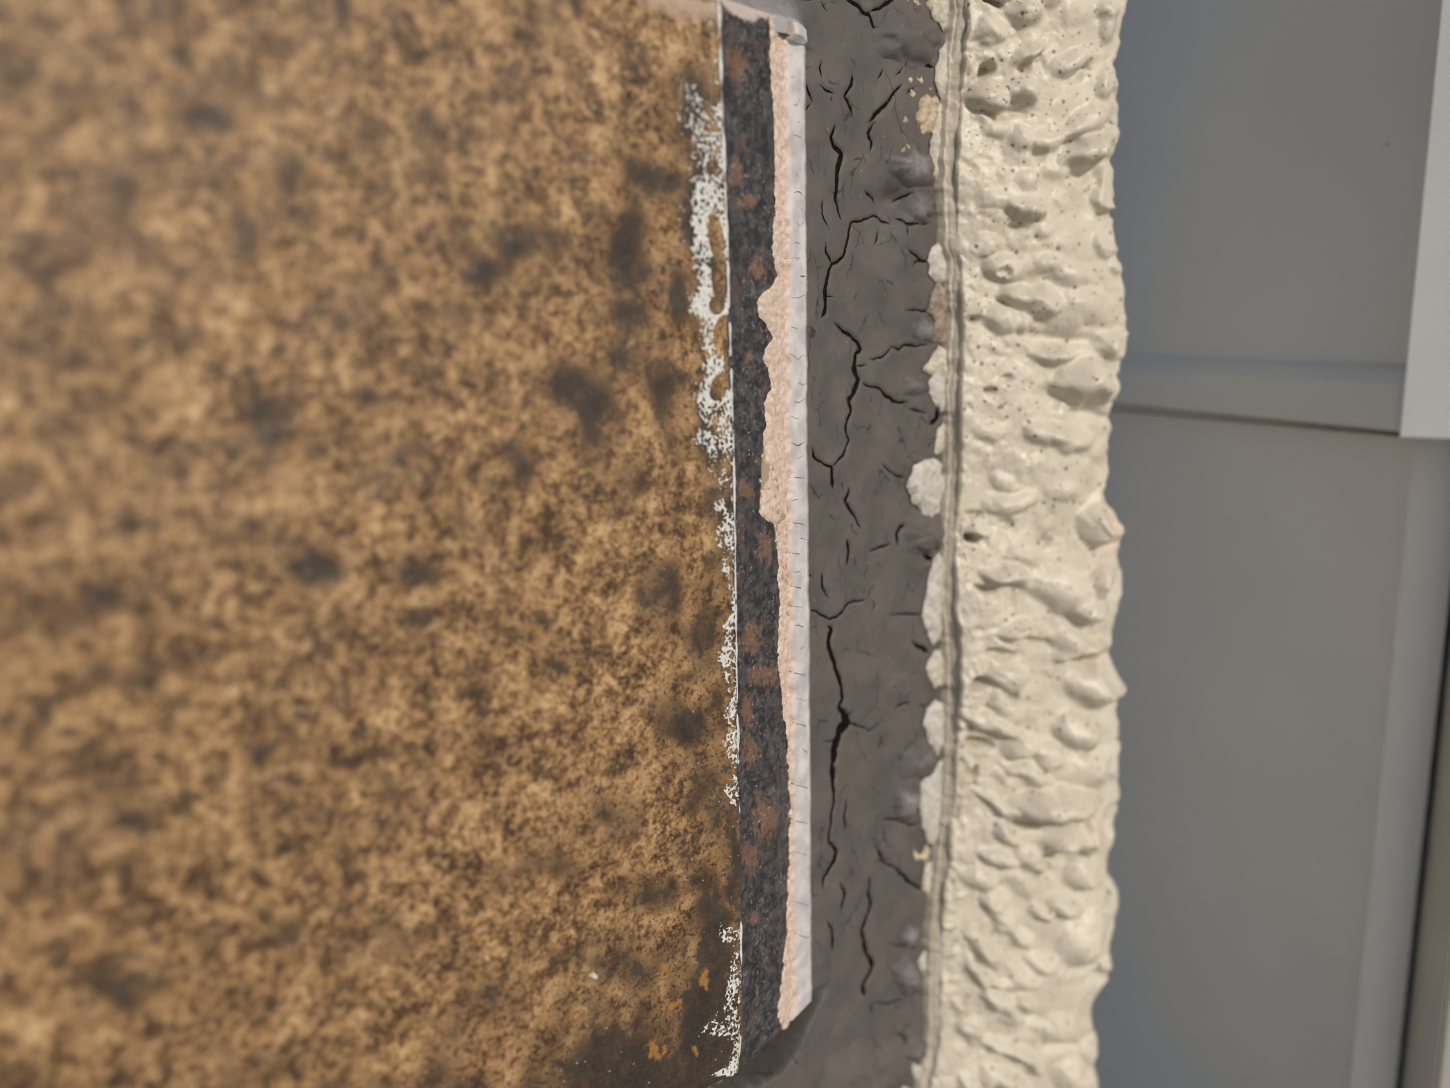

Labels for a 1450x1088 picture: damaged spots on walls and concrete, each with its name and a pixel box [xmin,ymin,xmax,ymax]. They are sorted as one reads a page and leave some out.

damp [677,0,770,812]
crack [807,0,893,28]
crack [784,34,939,1045]
damp [701,922,743,1077]